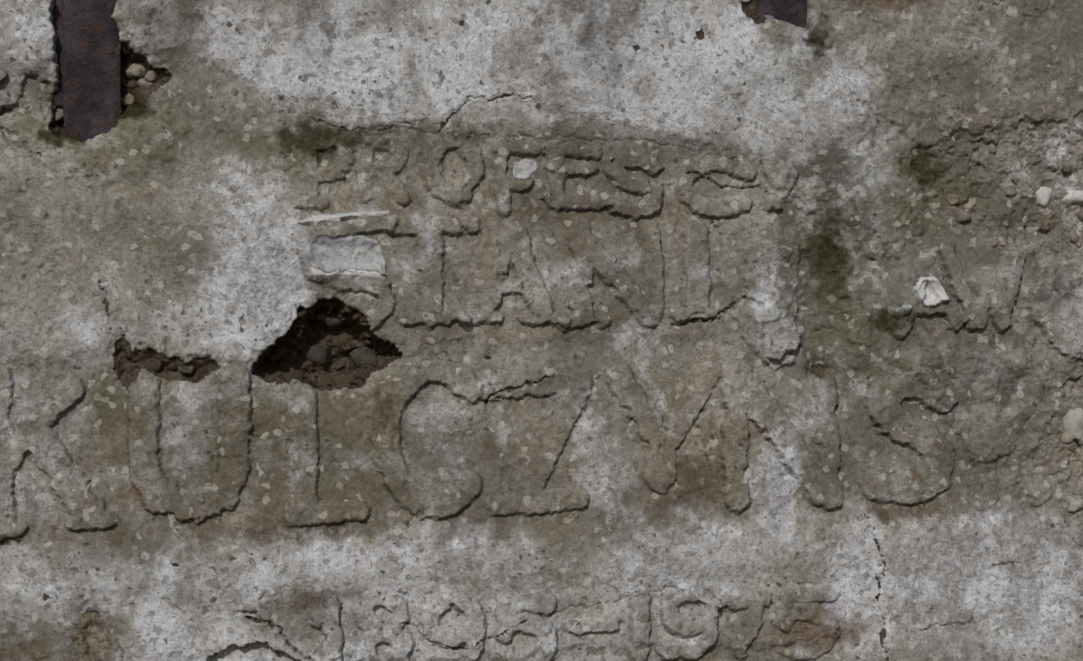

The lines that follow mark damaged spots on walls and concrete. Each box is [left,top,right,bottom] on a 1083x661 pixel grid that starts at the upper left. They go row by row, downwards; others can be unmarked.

crack [242,611,311,660]
crack [423,584,704,650]
crack [864,513,889,660]
crack [920,607,976,632]